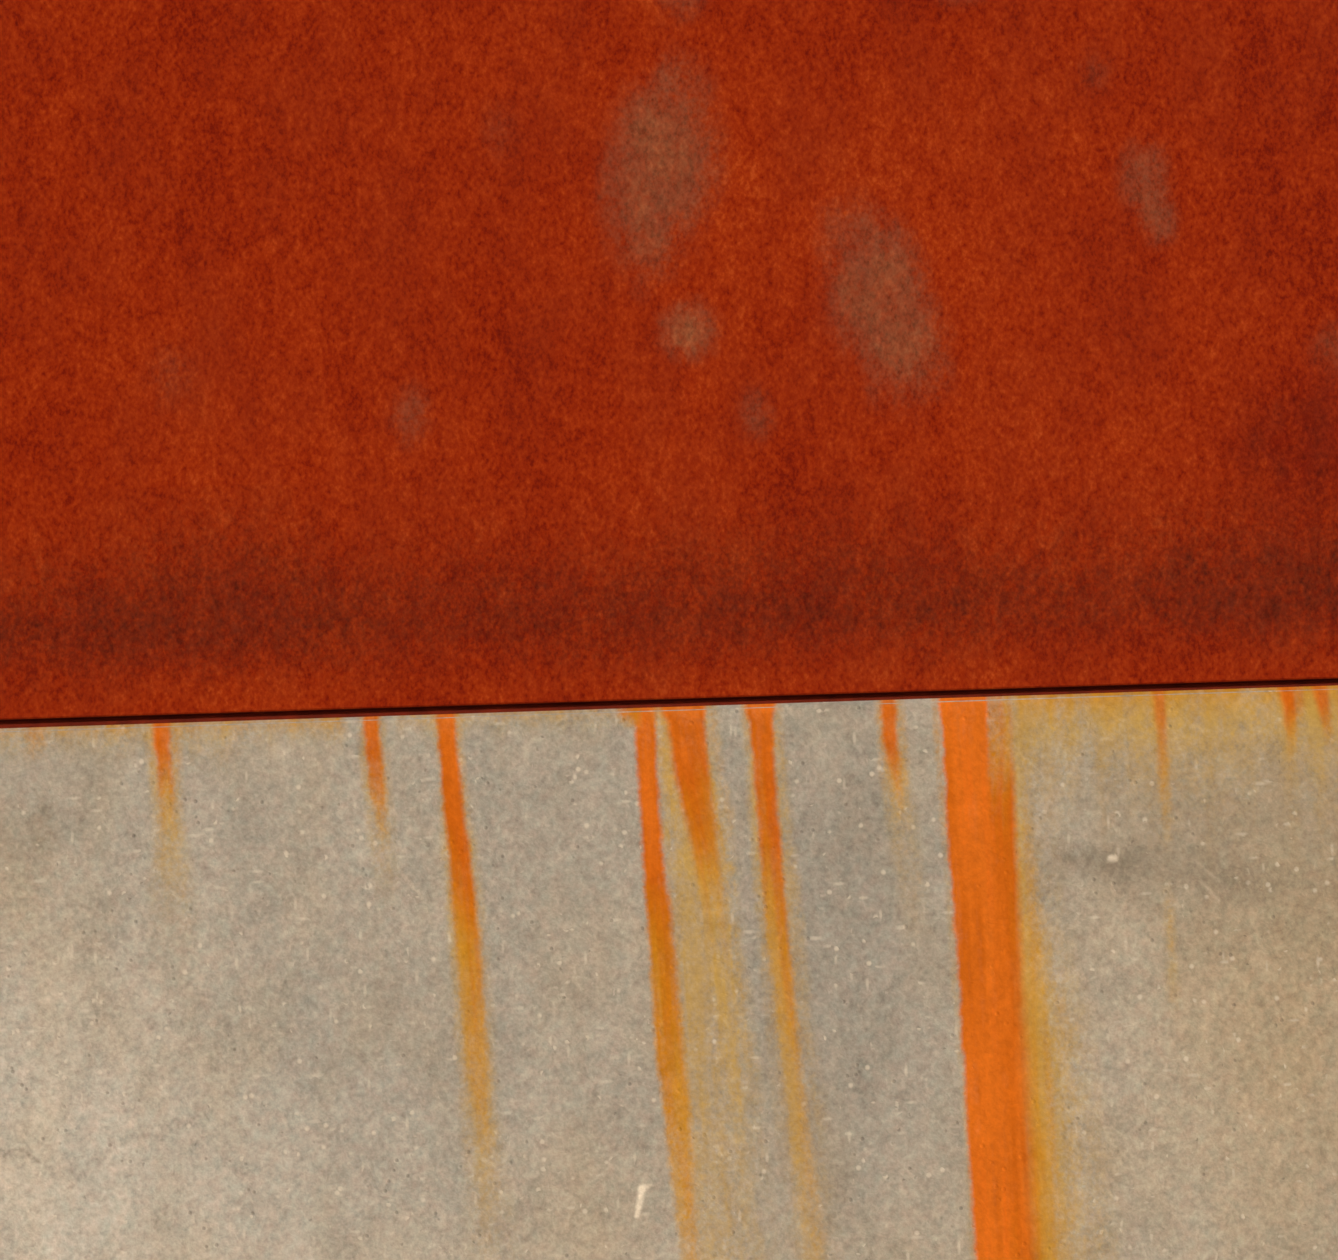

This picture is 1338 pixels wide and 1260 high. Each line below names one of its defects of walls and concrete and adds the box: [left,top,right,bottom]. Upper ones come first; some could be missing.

rust [0,703,850,1260]
rust [871,685,1338,1260]